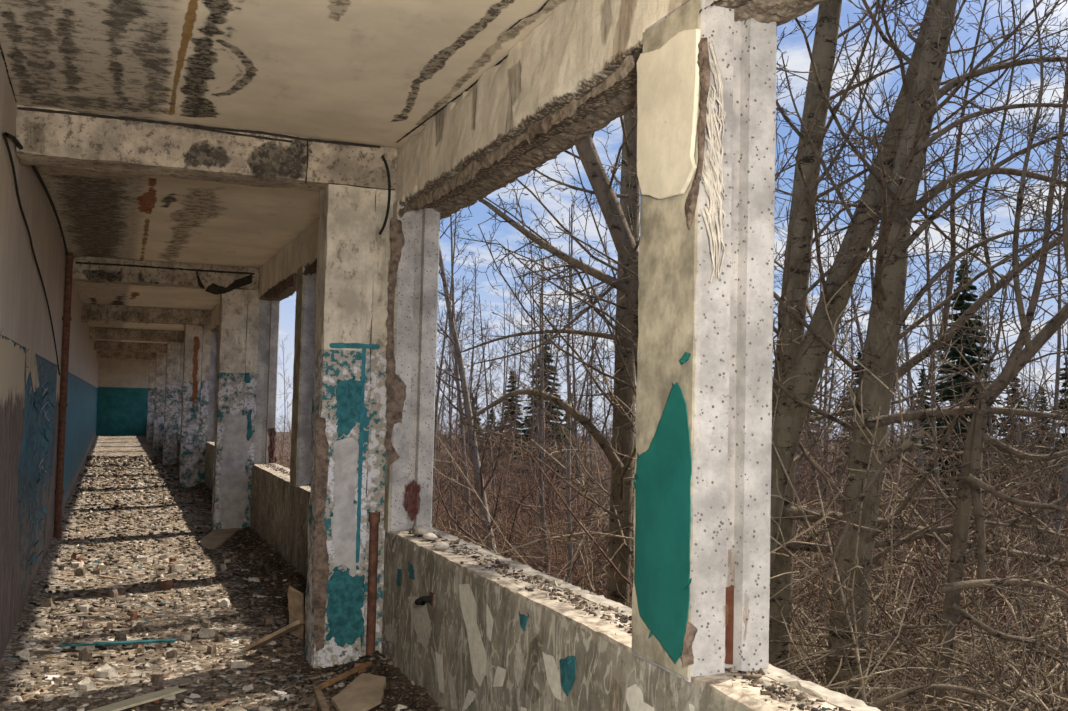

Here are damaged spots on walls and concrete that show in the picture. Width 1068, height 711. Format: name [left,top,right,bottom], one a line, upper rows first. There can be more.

leakage [2,0,258,118]
leakage [183,141,230,168]
leakage [248,139,312,180]
spalling [685,37,726,283]
leakage [49,175,138,283]
rust [137,178,156,261]
leakage [158,189,220,261]
spalling [384,55,637,465]
peeling [312,376,365,652]
rust [403,479,421,526]
peeling [633,382,698,667]
peeling [408,583,523,711]